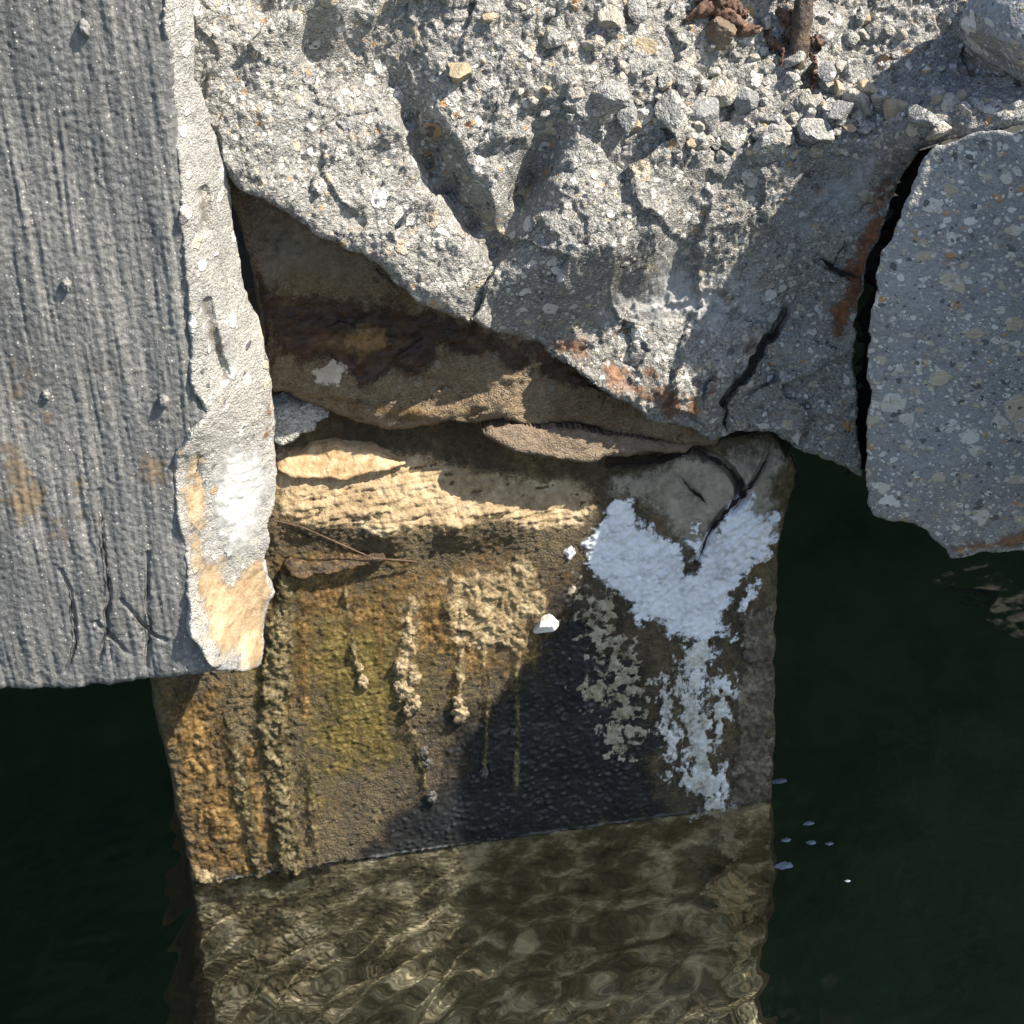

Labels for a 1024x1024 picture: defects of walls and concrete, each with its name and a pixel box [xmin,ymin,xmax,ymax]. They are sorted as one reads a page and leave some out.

spalling [162,0,721,672]
rust [602,362,716,420]
crack [723,309,787,433]
rust [830,179,896,340]
crack [817,143,942,475]
crack [60,493,163,671]